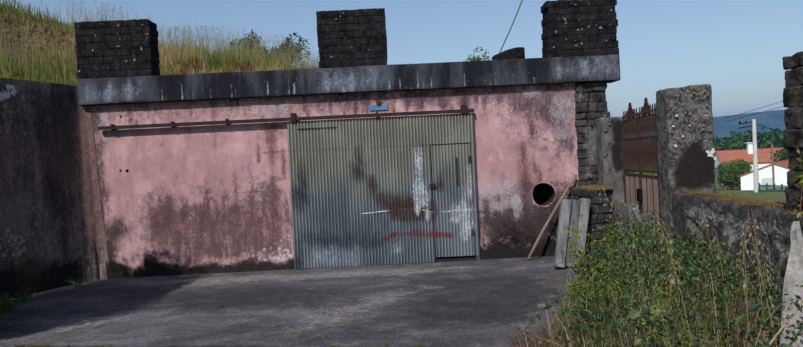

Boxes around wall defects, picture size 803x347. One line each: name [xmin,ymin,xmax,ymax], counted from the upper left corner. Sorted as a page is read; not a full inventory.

leakage [306,75,390,117]
leakage [396,68,574,156]
leakage [91,111,295,279]
corrosion [367,179,437,221]
leakage [478,144,573,260]
leakage [0,260,84,301]